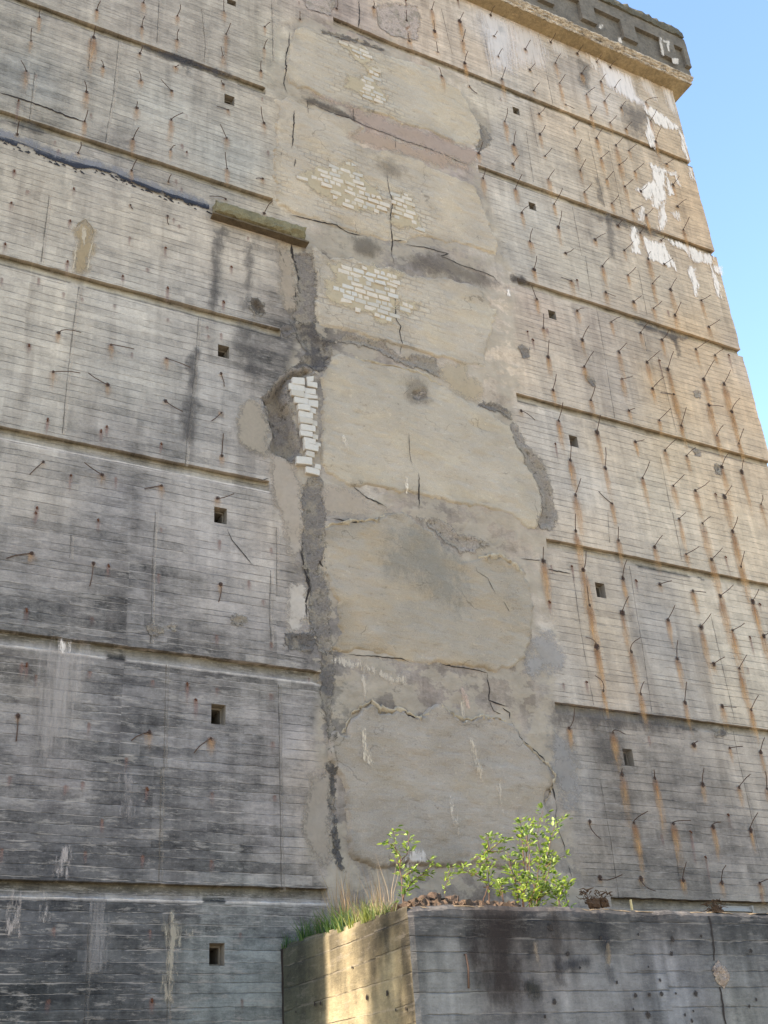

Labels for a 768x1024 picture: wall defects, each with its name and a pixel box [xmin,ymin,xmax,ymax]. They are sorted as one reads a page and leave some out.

spalling [375,2,421,41]
crack [283,33,465,166]
leakage [0,122,204,204]
peeling [296,161,425,233]
crack [293,176,498,282]
leakage [586,52,723,298]
peeling [263,250,440,464]
spalling [479,400,558,531]
crack [300,542,323,619]
spalling [283,476,345,871]
crack [443,664,545,761]
corrosion [589,604,603,677]